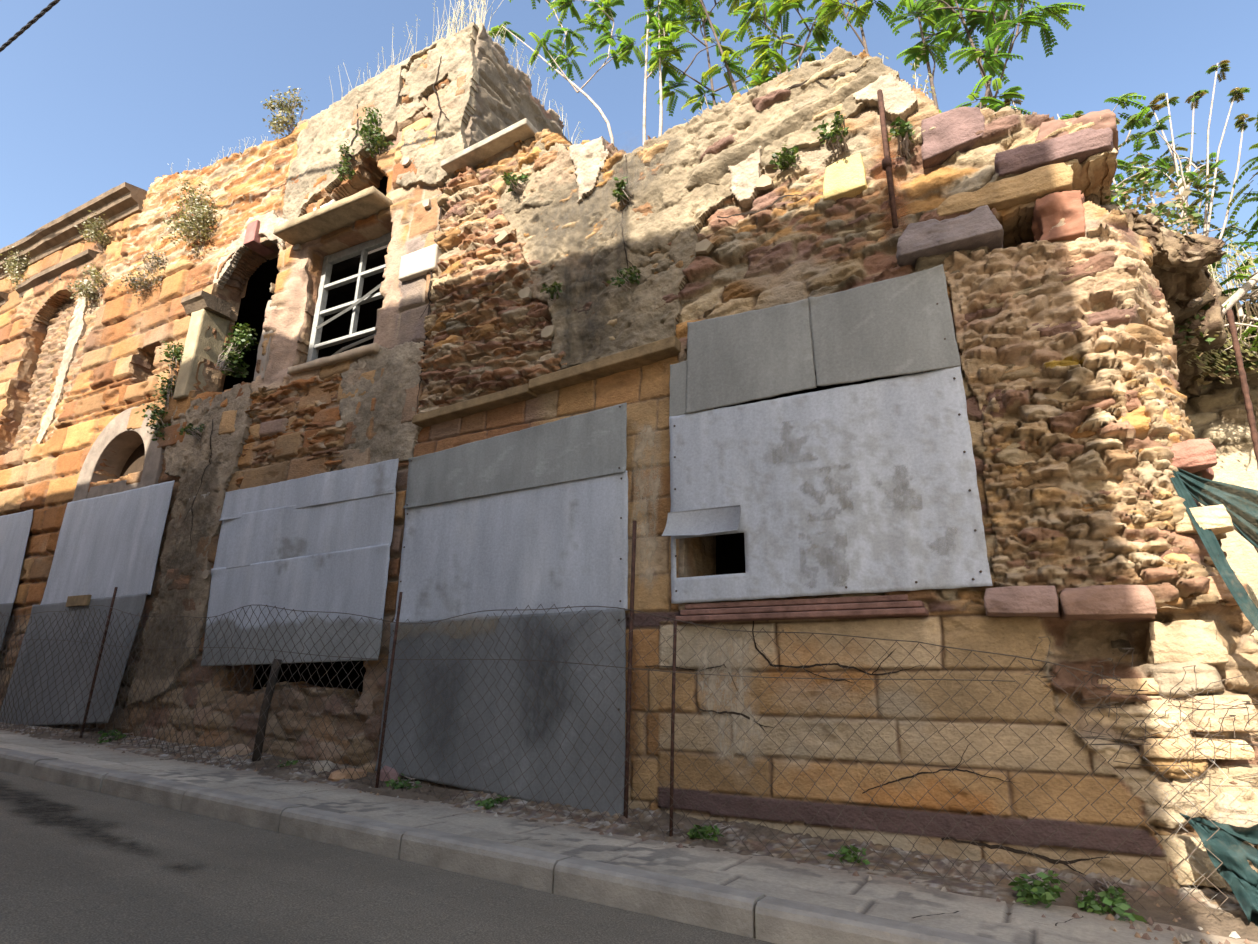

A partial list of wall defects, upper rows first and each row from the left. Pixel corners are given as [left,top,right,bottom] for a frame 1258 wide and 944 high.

peeling [125,22,918,707]